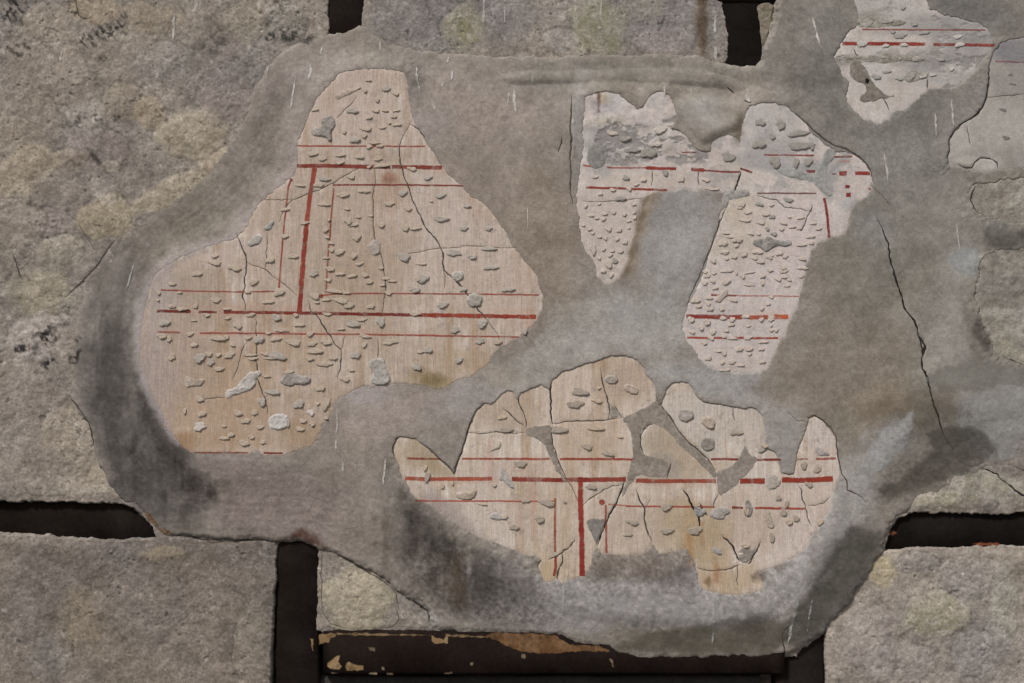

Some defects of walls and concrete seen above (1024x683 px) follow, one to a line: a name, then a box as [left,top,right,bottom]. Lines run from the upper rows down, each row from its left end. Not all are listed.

spalling [834,53,930,102]
spalling [312,115,336,142]
spalling [753,236,792,252]
crack [204,124,515,414]
crack [797,115,1024,496]
spalling [280,373,311,386]
spalling [268,413,289,430]
spalling [678,409,716,452]
crack [424,375,652,576]
crack [667,464,718,526]
crack [788,412,867,525]
crack [699,537,761,585]